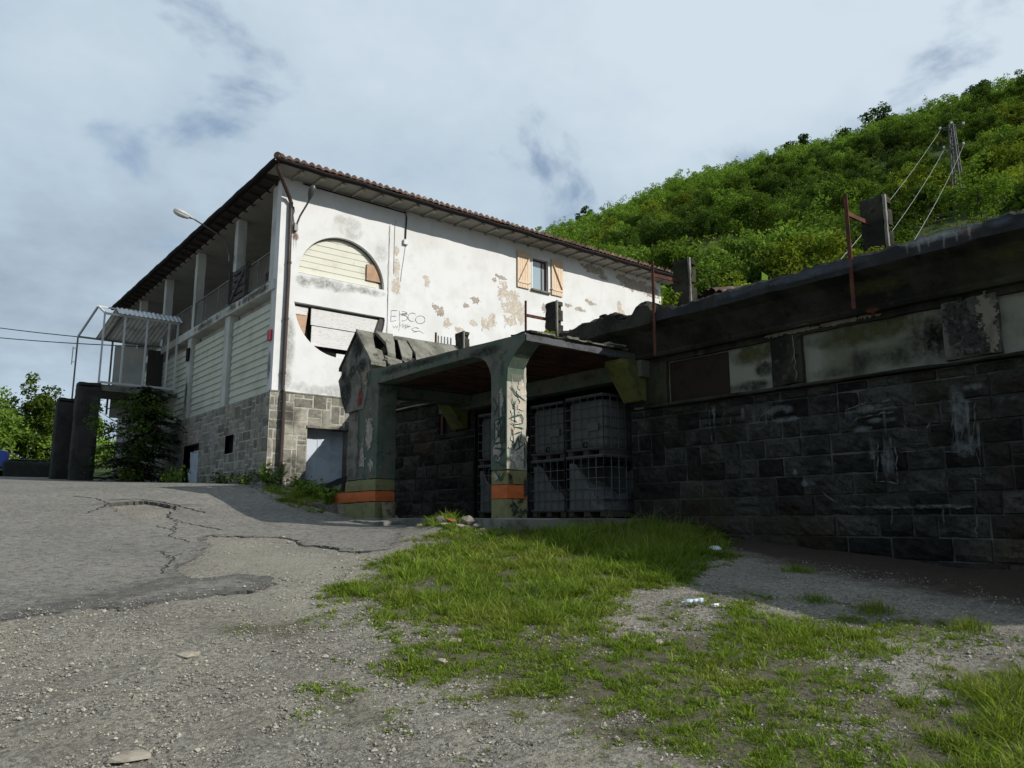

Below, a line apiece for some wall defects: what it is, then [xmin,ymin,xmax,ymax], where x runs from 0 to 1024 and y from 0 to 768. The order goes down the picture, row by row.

peeling [432,274,525,333]
peeling [975,290,1000,352]
peeling [358,408,374,471]